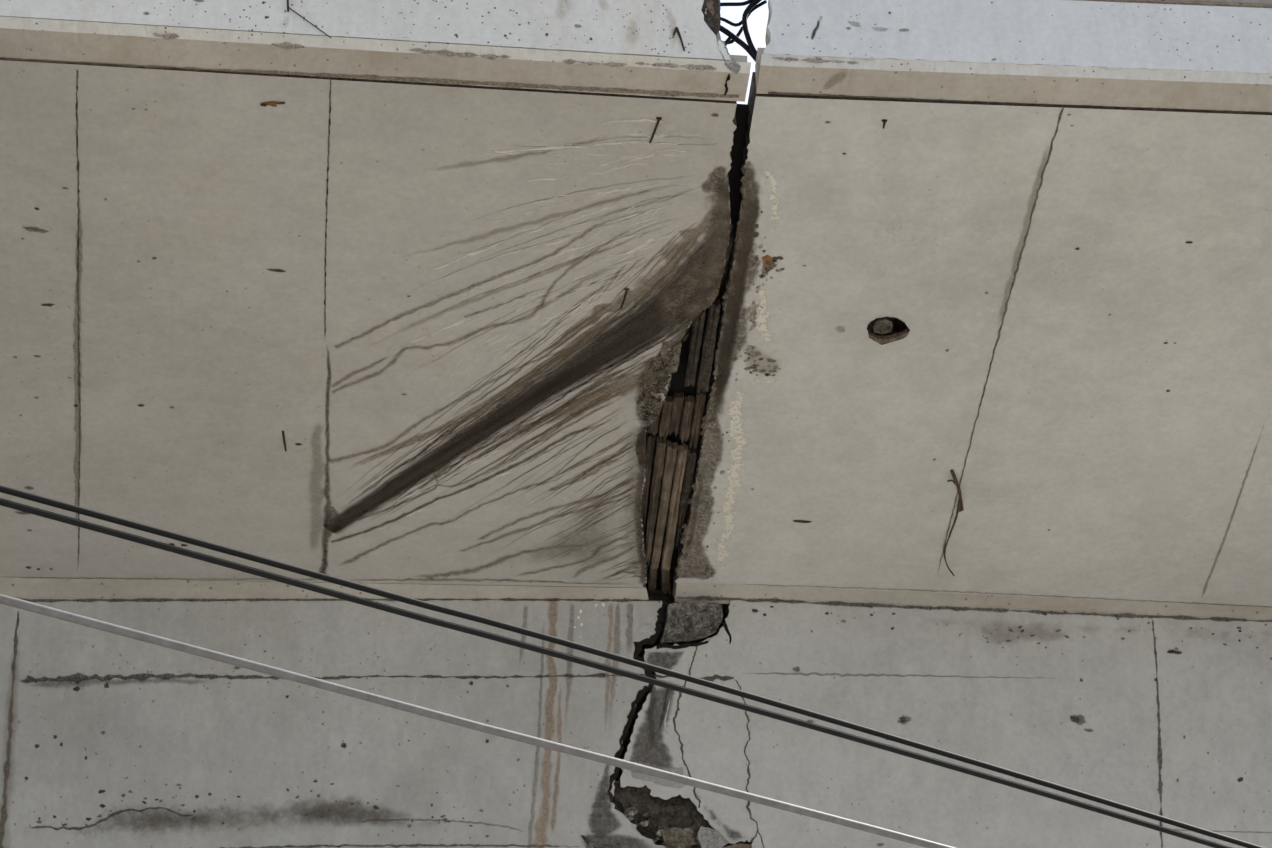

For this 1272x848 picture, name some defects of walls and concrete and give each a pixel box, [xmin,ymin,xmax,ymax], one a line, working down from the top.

spalling [701,0,741,75]
damp [466,119,702,183]
peeling [734,211,778,382]
damp [320,165,785,584]
spalling [636,341,682,466]
crack [607,600,764,848]
damp [32,777,195,830]
damp [590,765,620,836]
spalling [582,781,752,848]